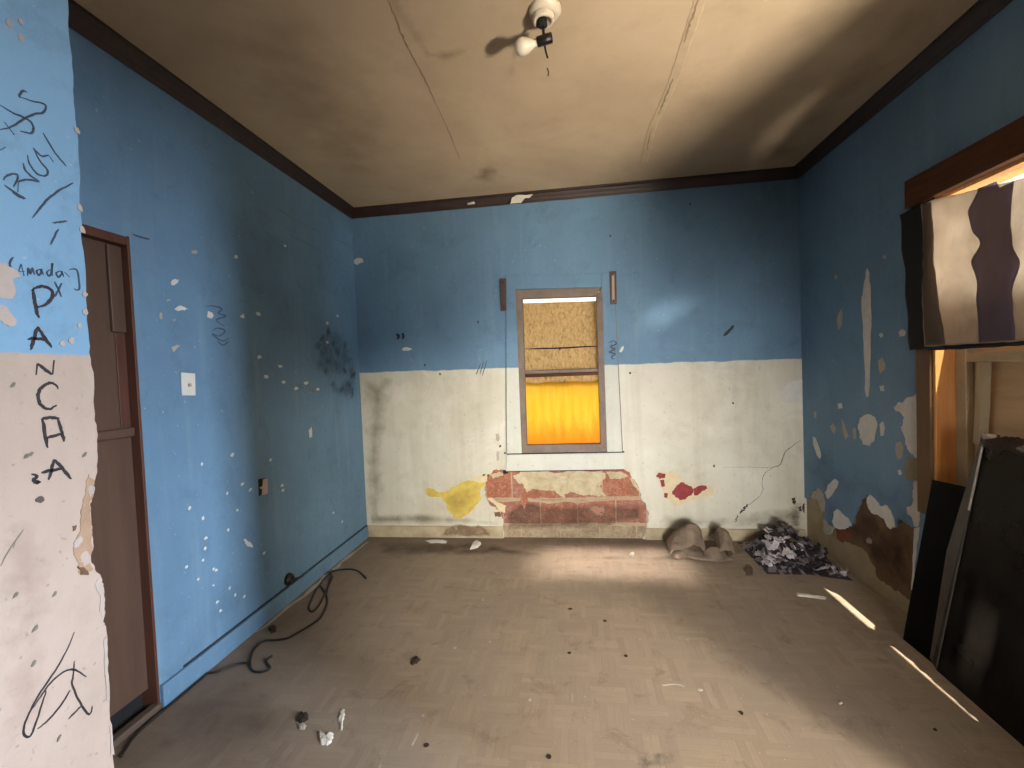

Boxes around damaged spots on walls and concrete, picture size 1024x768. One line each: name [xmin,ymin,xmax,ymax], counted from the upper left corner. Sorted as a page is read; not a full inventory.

crack [387,0,460,159]
crack [641,0,706,163]
peeling [861,268,885,397]
flaking render [73,474,105,617]
flaking render [425,433,649,538]
peeling [656,471,714,506]
crack [749,440,801,505]
flaking render [810,394,920,600]